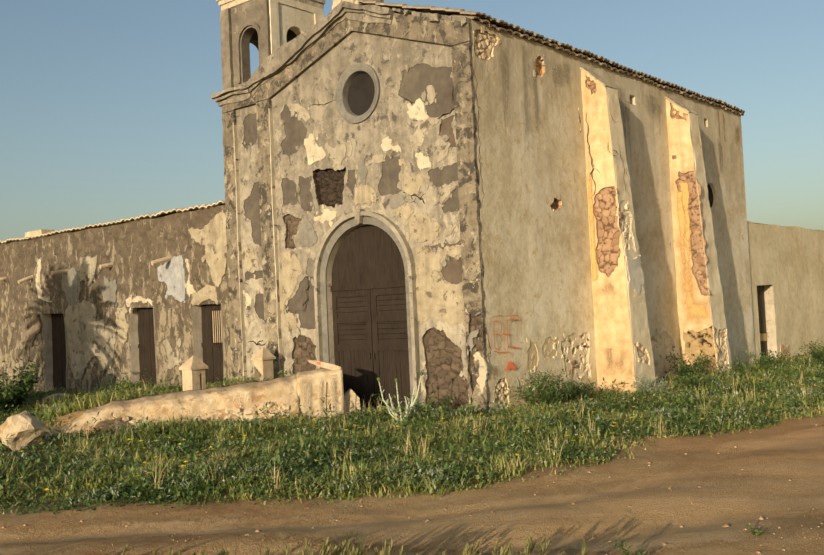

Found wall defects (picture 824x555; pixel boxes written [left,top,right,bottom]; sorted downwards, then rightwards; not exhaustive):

peeling [242,113,257,154]
crack [438,91,455,132]
peeling [35,257,52,302]
peeling [62,255,154,381]
peeling [157,210,227,305]
peeling [242,181,264,320]
peeling [278,63,459,374]
peeling [415,239,592,412]
flaking render [550,194,563,212]
flaking render [593,186,644,294]
flaking render [634,325,730,382]
flaking render [673,171,712,296]